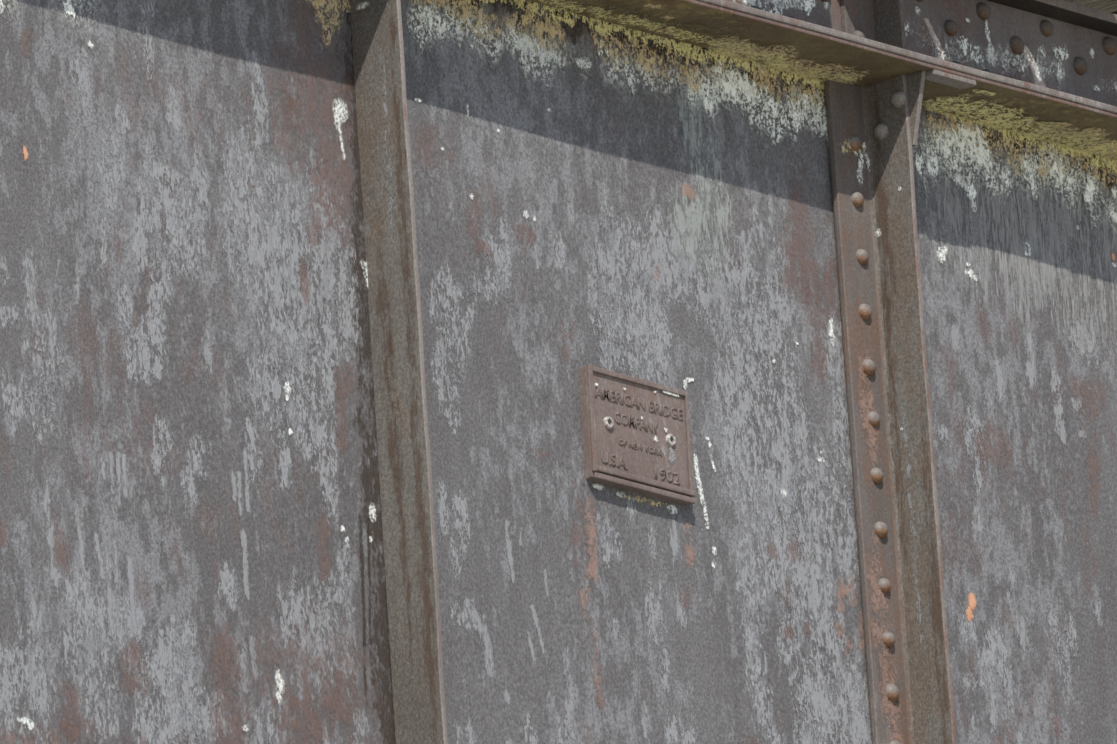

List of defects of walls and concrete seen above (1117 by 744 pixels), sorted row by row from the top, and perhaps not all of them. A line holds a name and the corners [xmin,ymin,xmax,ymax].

peeling [0,47,370,744]
peeling [306,0,351,46]
peeling [436,481,470,580]
peeling [427,218,512,435]
damp [407,0,829,280]
peeling [587,178,872,744]
peeling [964,354,1005,555]
damp [914,108,1117,363]
efflorescence [1001,49,1062,80]
peeling [1024,323,1090,445]
peeling [450,598,496,677]
peeling [957,564,1028,744]